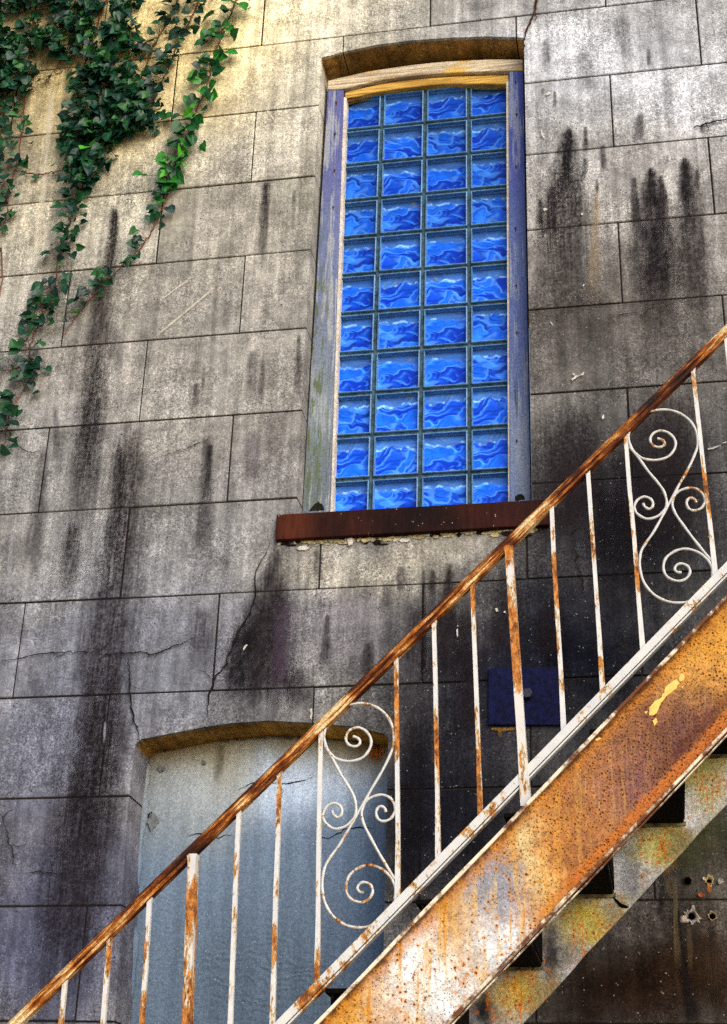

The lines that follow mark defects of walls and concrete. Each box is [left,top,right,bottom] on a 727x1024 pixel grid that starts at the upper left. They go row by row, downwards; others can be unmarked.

crack [522,0,538,55]
water stain [538,127,599,282]
water stain [632,158,708,325]
water stain [75,211,118,508]
water stain [43,436,140,968]
crack [1,633,201,749]
crack [200,542,270,735]
rust [368,744,384,761]